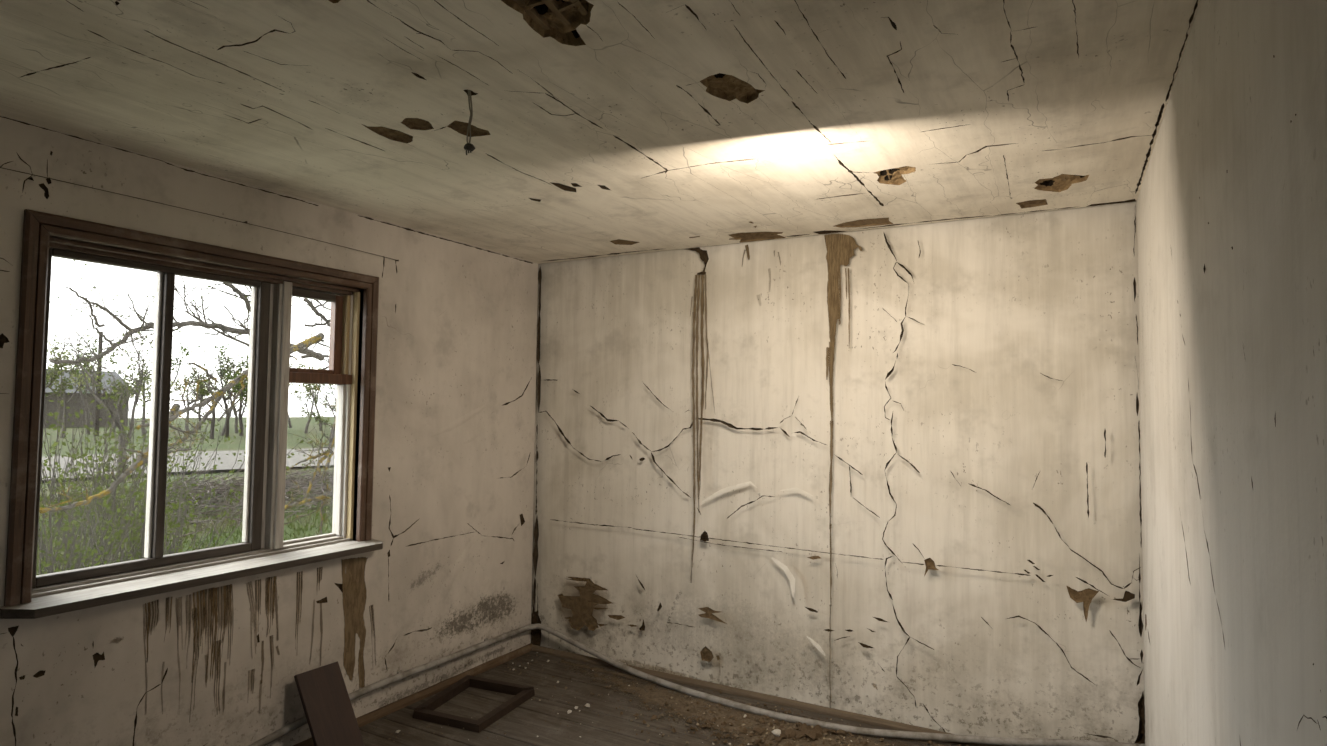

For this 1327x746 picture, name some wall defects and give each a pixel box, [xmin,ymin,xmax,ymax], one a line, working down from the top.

spalling [501,0,594,46]
crack [0,116,318,206]
spalling [362,118,491,143]
spalling [686,72,766,104]
spalling [1016,174,1089,209]
water stain [690,275,715,583]
crack [358,0,1198,744]
water stain [824,234,862,708]
crack [1179,381,1225,646]
crack [2,626,19,746]
water stain [192,584,233,710]
water stain [295,557,376,688]